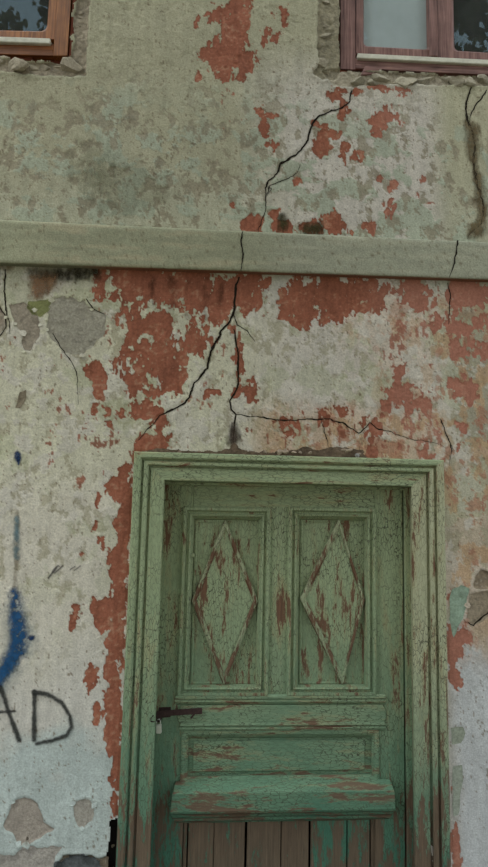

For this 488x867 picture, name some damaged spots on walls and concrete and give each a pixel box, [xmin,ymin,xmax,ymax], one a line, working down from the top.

peeling [194,0,290,84]
crack [448,87,487,324]
crack [0,269,10,336]
peeling [9,269,488,458]
crack [139,90,453,458]
peeling [69,462,131,817]
peeling [448,569,488,691]
flaking render [0,795,115,867]
peeling [452,765,463,867]